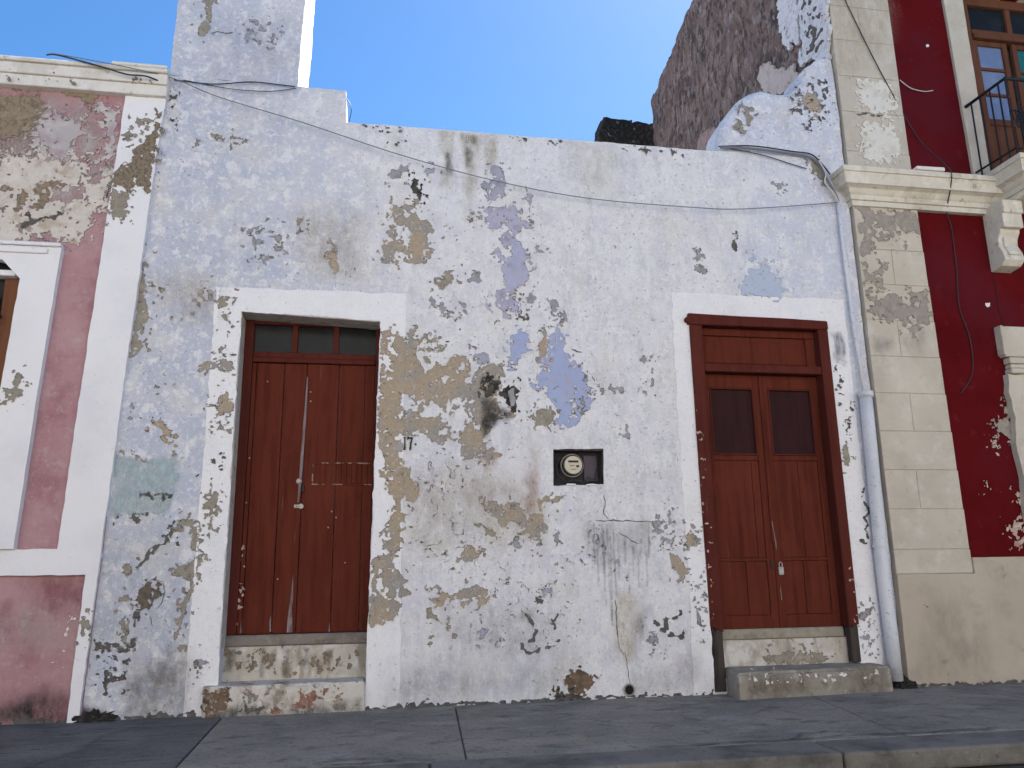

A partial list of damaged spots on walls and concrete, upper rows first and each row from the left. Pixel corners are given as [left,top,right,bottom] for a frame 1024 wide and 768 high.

peeling [0,72,181,252]
spalling [732,102,759,136]
peeling [757,0,837,133]
peeling [849,75,903,168]
peeling [854,206,934,341]
water stain [483,401,503,432]
spalling [368,159,662,650]
spalling [986,397,1011,456]
peeling [978,480,1024,551]
spalling [51,452,227,697]
crack [365,600,714,710]
spalling [556,665,602,701]